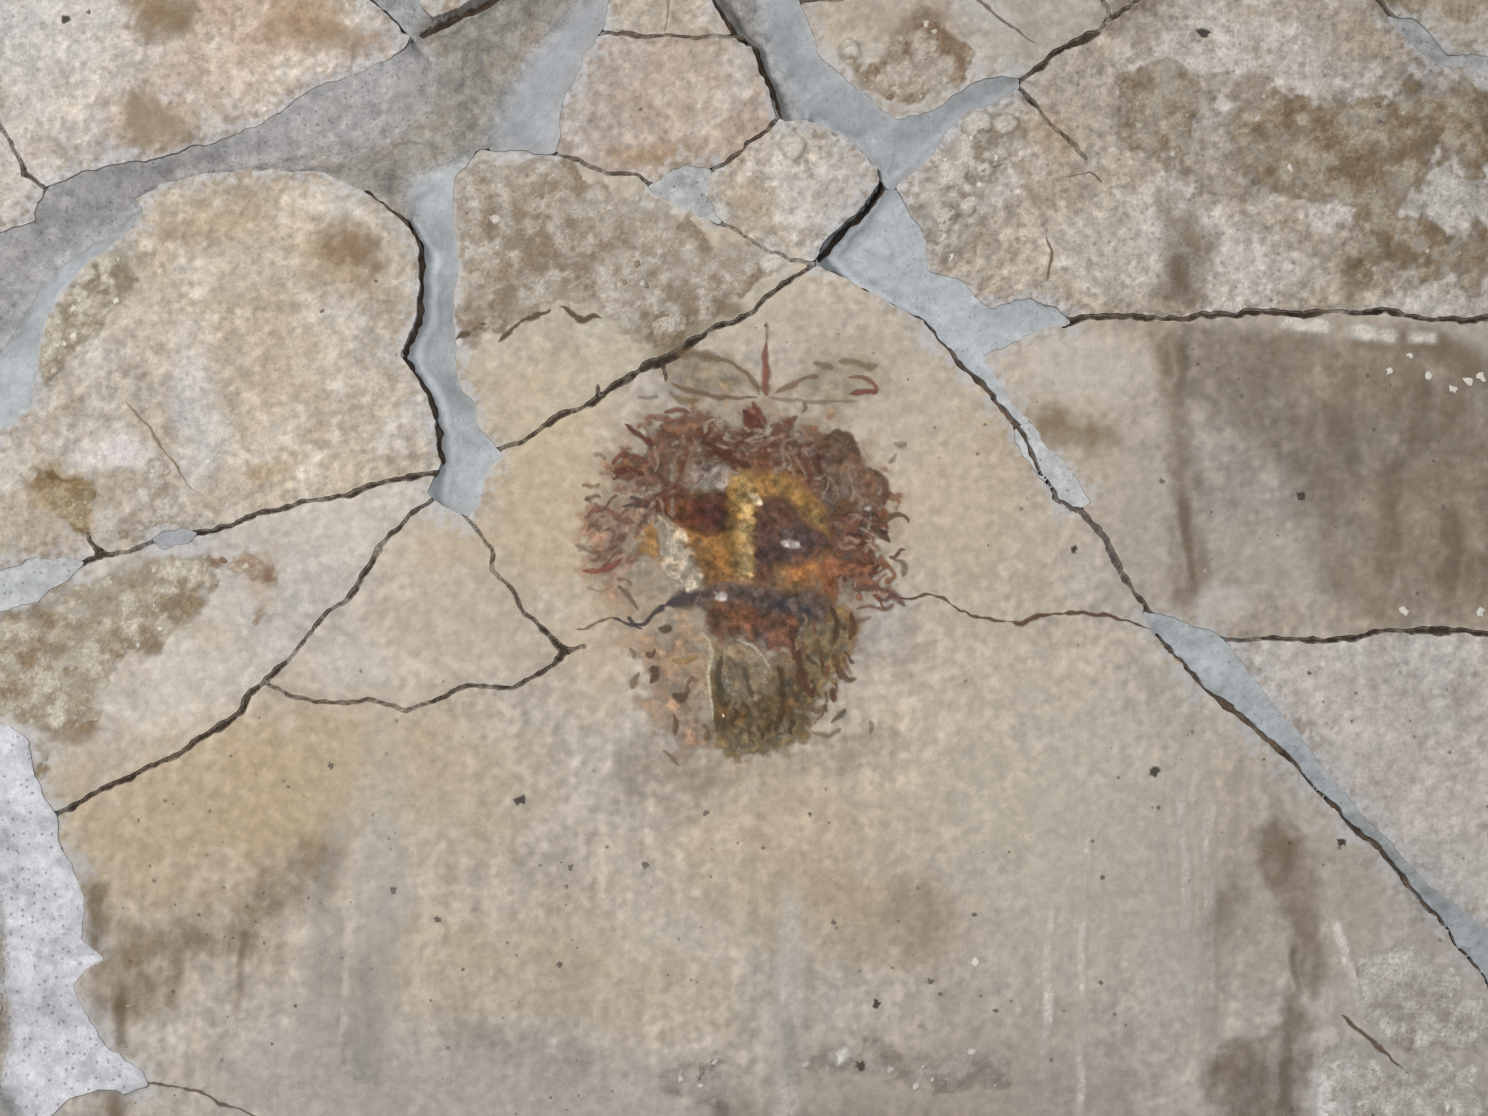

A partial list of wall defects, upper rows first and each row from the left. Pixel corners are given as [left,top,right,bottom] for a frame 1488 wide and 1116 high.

crack [373,0,500,39]
crack [600,0,781,172]
crack [977,0,1142,183]
crack [0,123,48,191]
crack [555,153,652,187]
crack [498,183,883,452]
crack [1065,308,1488,328]
water stain [1279,316,1488,401]
crack [57,192,712,815]
crack [900,317,1488,988]
crack [1342,1015,1409,1075]
water stain [1311,1070,1351,1116]